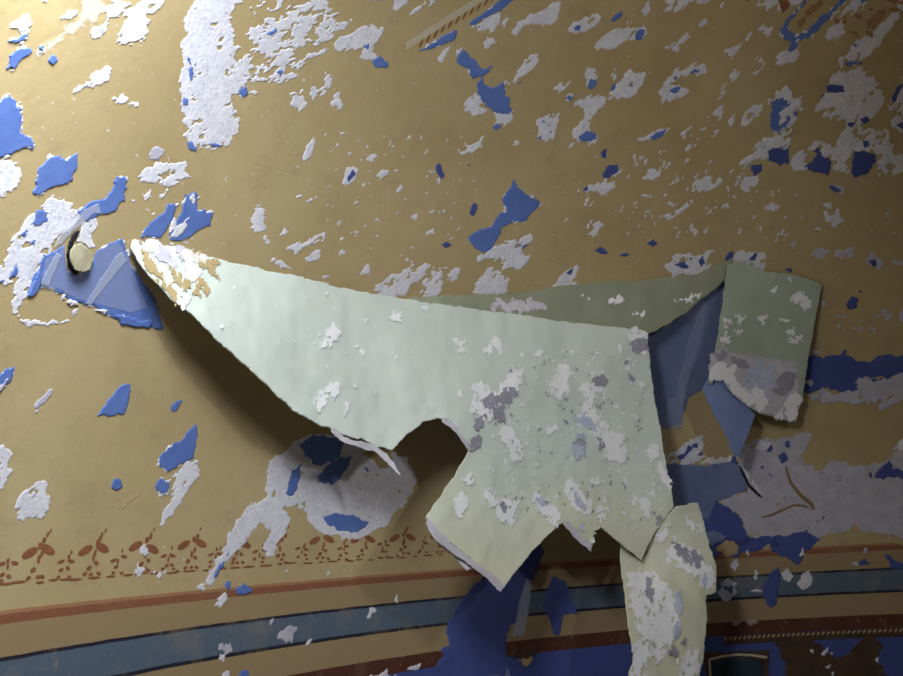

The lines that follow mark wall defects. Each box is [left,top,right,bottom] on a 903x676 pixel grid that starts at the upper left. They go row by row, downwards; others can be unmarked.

peeling [6,14,58,72]
flaking render [60,10,78,20]
peeling [90,0,165,46]
peeling [568,1,651,51]
flaking render [73,66,112,94]
flaking render [112,94,139,107]
peeling [178,0,388,151]
flaking render [302,133,326,161]
peeling [553,67,646,207]
peeling [615,0,903,238]
peeling [0,146,903,676]